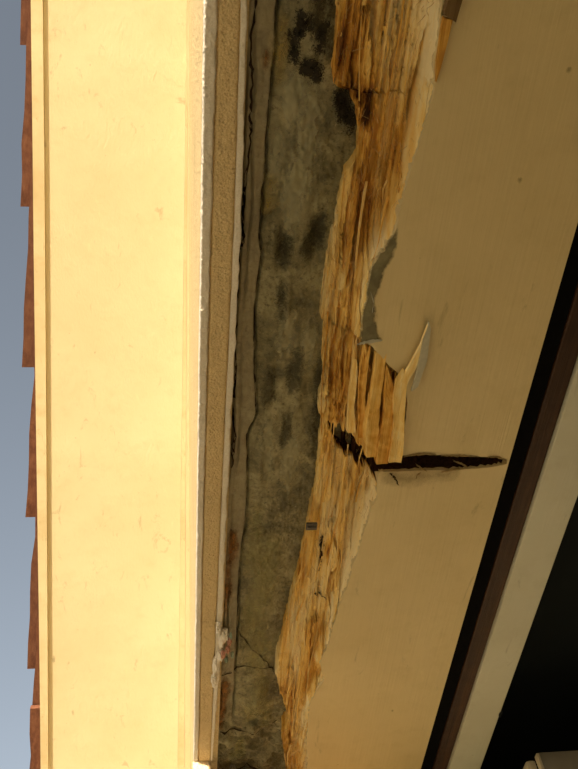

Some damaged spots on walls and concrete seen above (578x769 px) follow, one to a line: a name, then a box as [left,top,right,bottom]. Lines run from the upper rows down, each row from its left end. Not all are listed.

peeling [435,0,462,82]
water stain [265,0,336,269]
water stain [332,87,357,140]
peeling [357,233,397,345]
water stain [275,285,323,455]
crack [372,453,507,485]